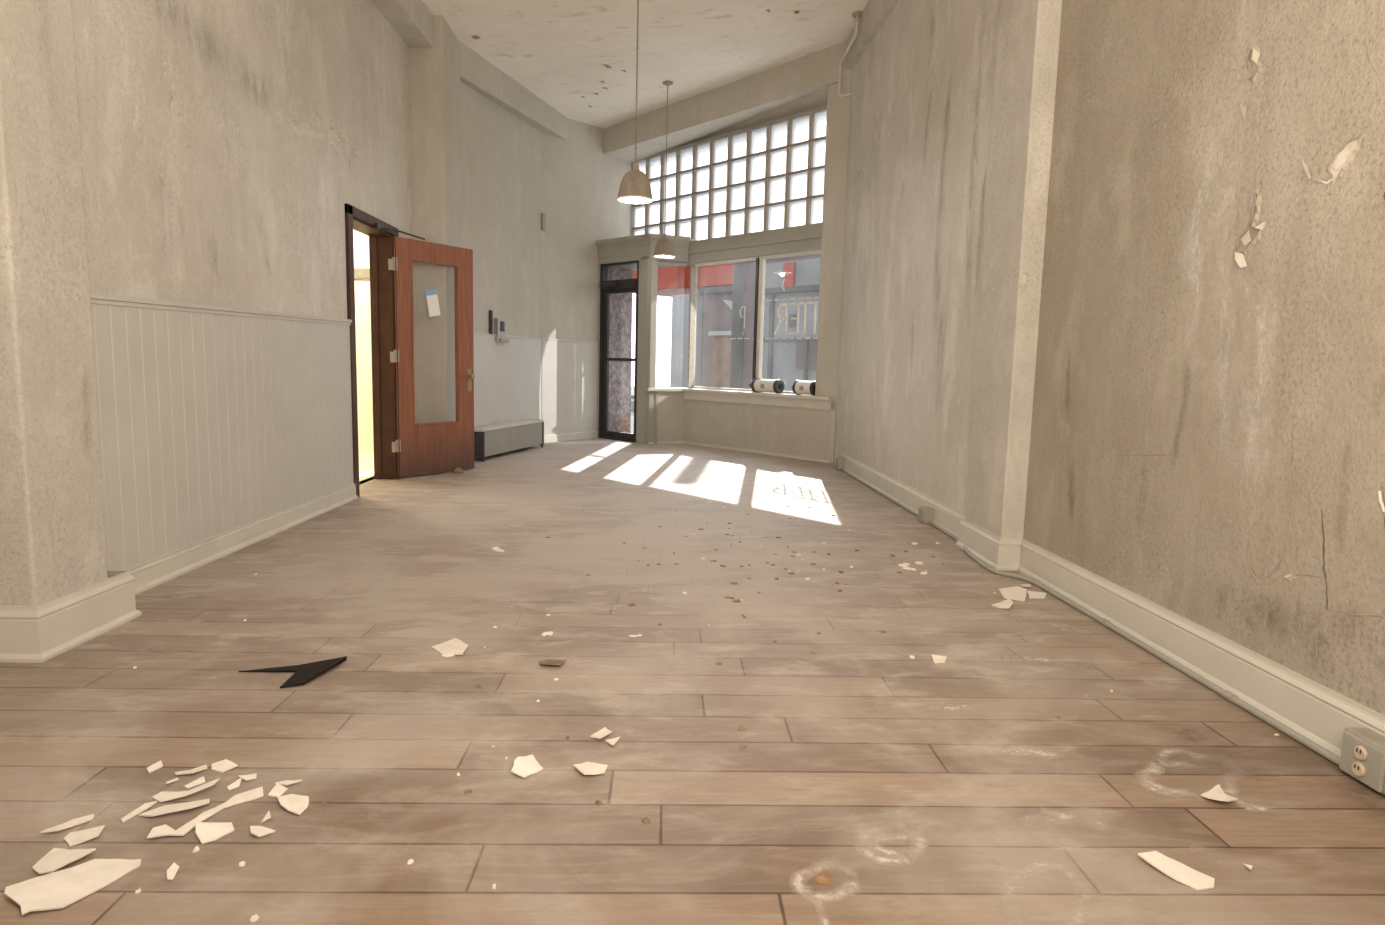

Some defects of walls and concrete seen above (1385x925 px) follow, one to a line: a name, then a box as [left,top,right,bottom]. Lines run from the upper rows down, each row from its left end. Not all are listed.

peeling [1302,134,1365,185]
peeling [1235,189,1266,268]
crack [1247,328,1385,662]